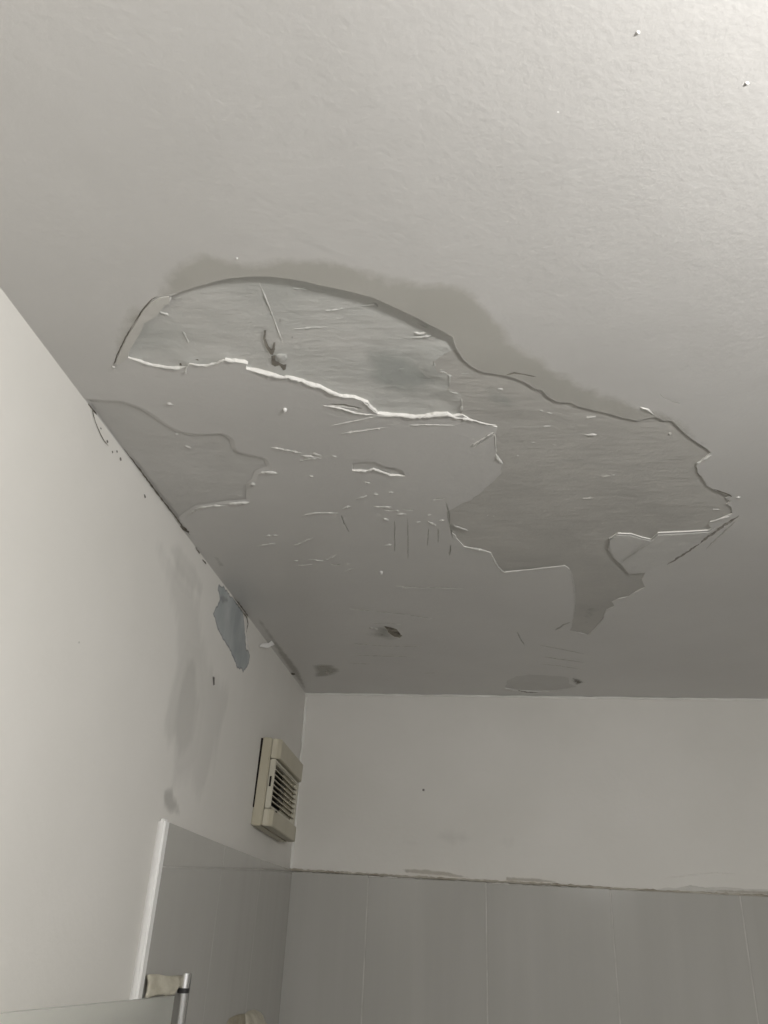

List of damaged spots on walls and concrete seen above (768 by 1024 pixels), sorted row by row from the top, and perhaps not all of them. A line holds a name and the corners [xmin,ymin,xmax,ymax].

peeling [85,399,278,521]
peeling [116,276,732,636]
peeling [214,585,275,671]
spalling [369,626,402,638]